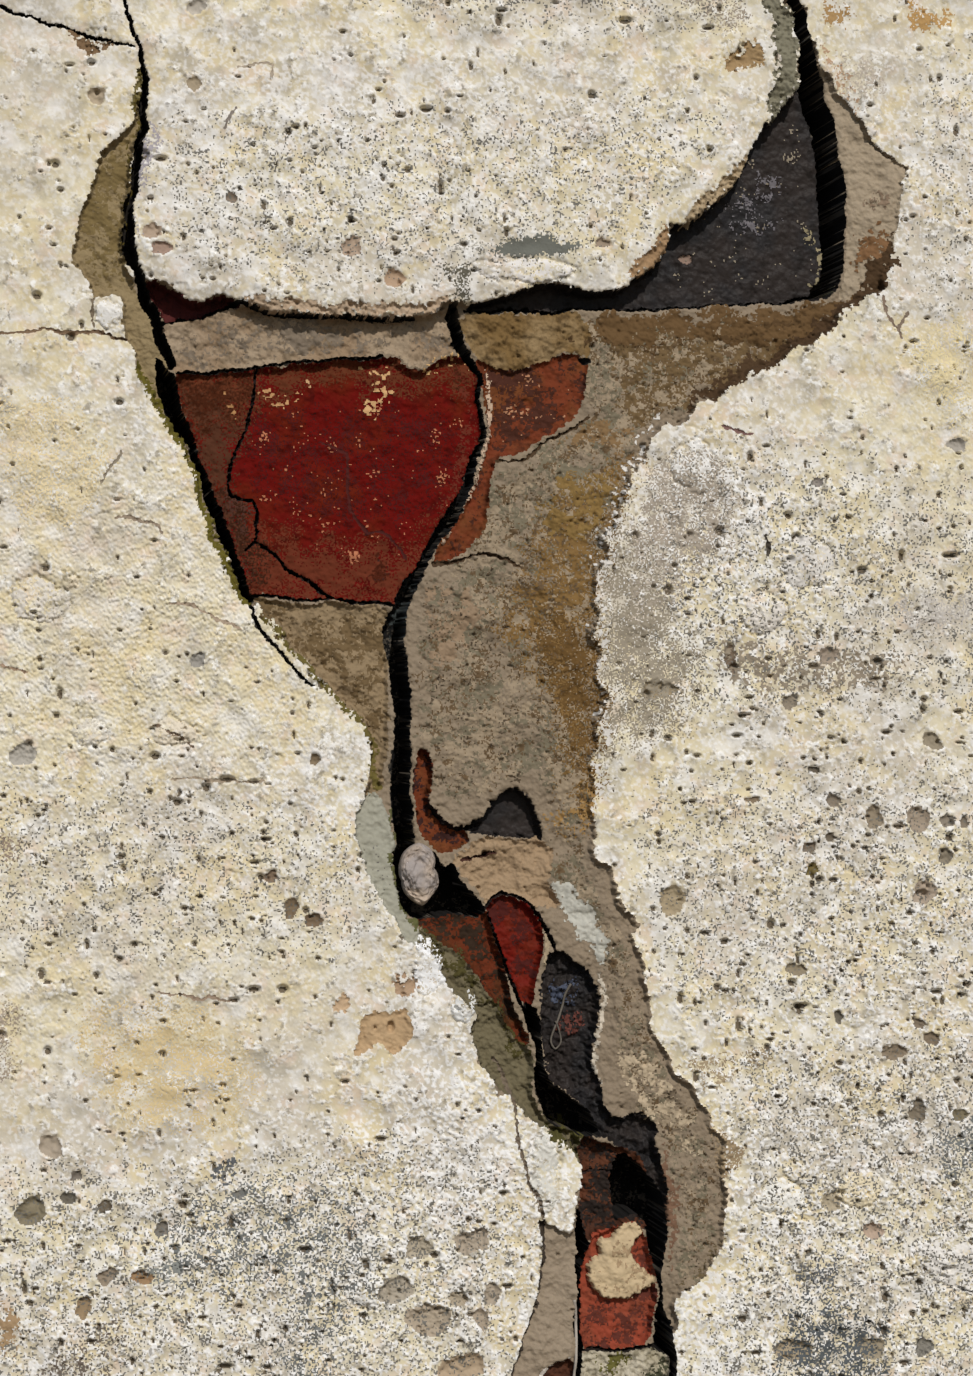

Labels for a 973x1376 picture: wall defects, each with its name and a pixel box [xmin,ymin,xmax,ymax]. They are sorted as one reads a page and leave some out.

spalling [71,68,231,562]
crack [882,295,909,339]
crack [0,0,847,1138]
spalling [233,0,909,1345]
spalling [913,1019,940,1045]
spalling [907,1096,926,1123]
spalling [97,1200,112,1213]
hole [97,1268,155,1287]
spalling [513,1189,590,1376]
hole [75,1297,92,1320]
spalling [915,1337,934,1357]
hole [437,1353,485,1376]